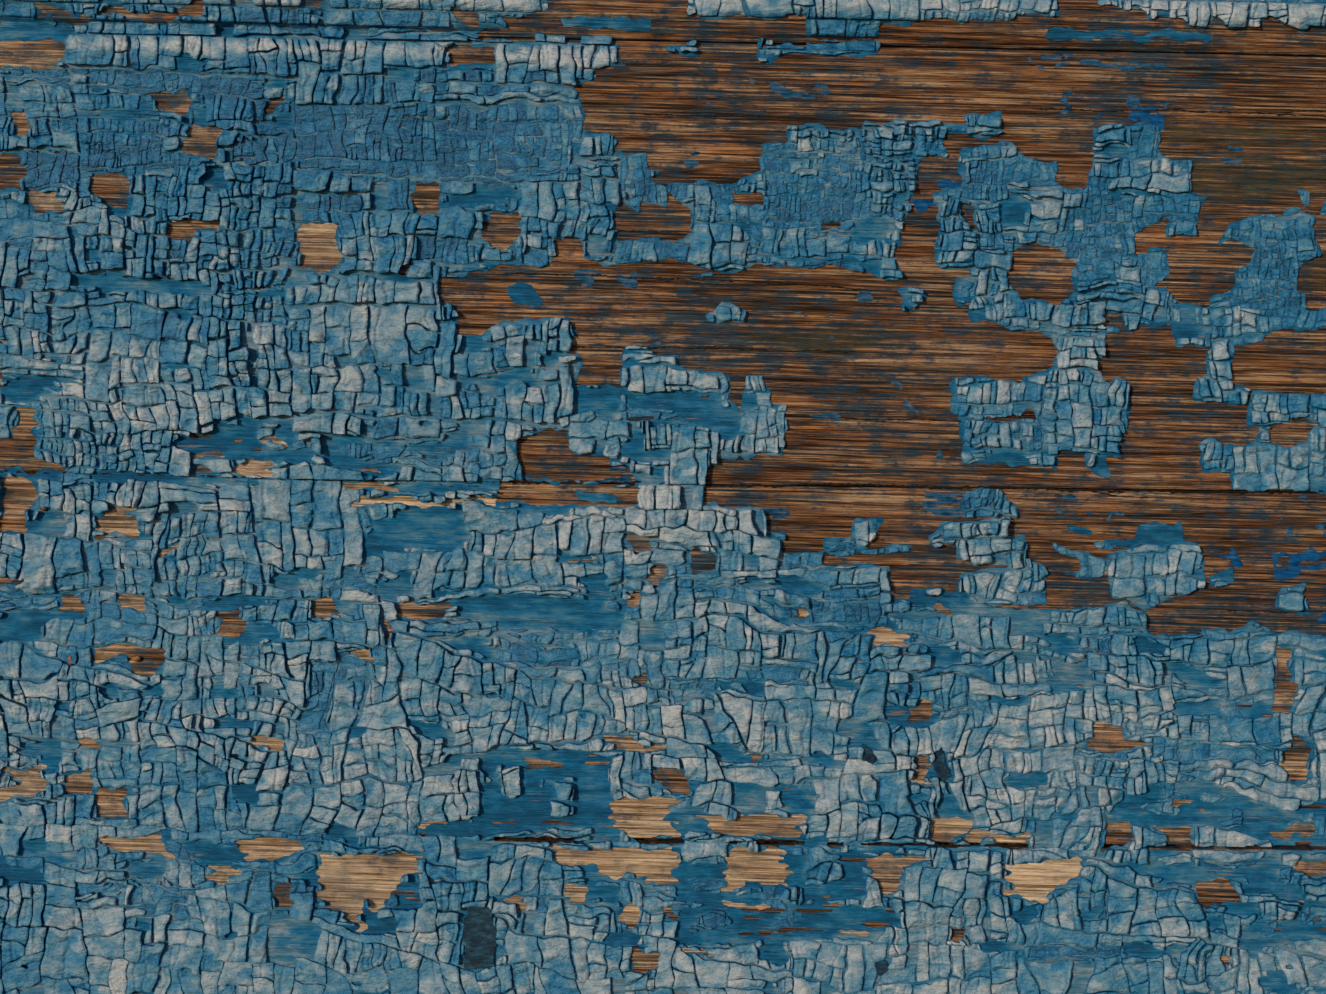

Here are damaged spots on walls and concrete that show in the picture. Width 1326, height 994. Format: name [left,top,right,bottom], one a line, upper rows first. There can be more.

peeling [687,0,1326,65]
peeling [194,0,1003,407]
crack [495,272,868,290]
peeling [932,122,1326,494]
peeling [0,0,841,994]
crack [0,465,1325,499]
peeling [718,487,1326,994]
crack [496,835,584,843]
crack [637,837,679,845]
crack [730,837,838,845]
crack [896,841,1023,849]
peeling [549,838,978,994]